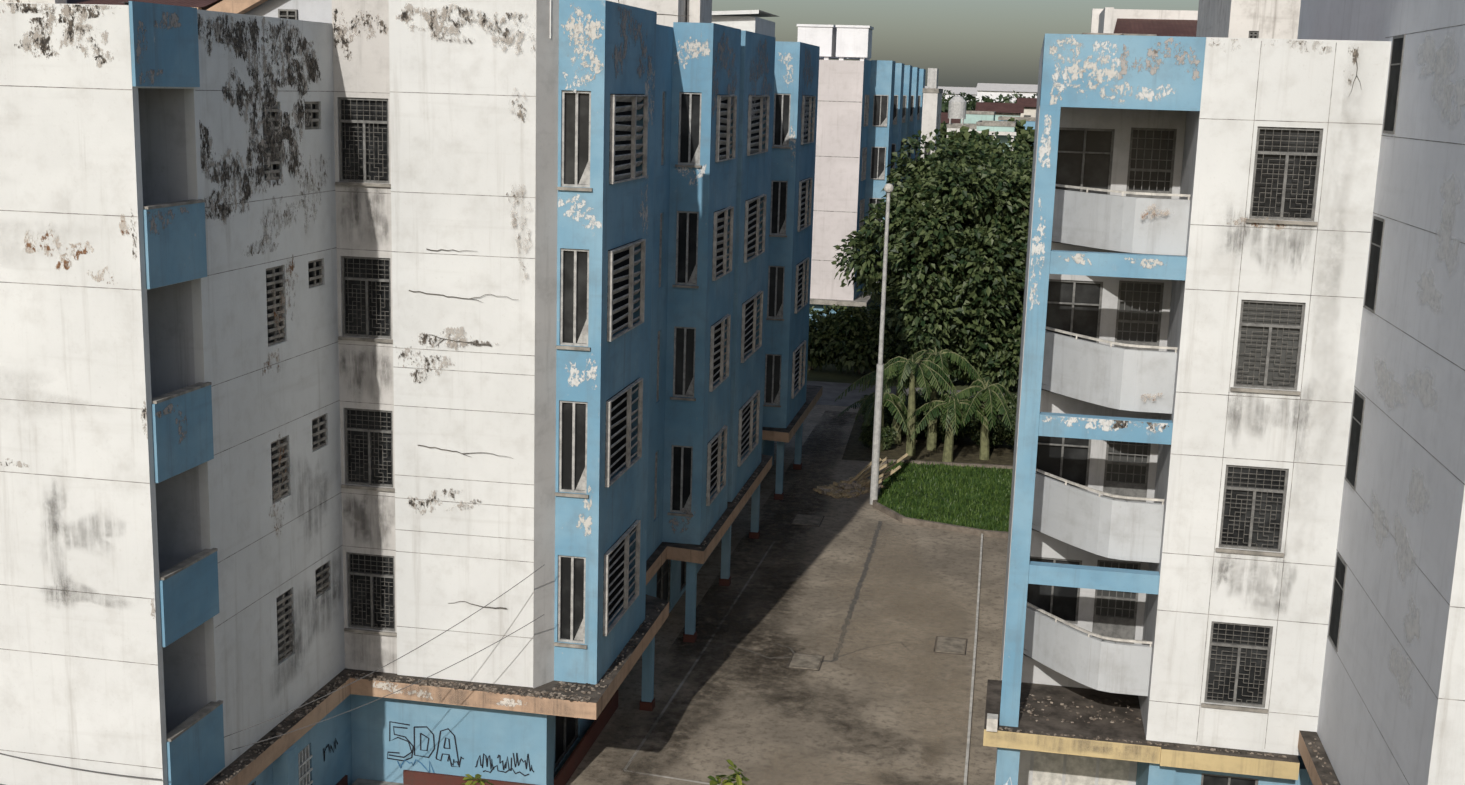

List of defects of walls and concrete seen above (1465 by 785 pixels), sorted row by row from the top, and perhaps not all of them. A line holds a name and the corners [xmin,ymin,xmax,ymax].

leakage [2,0,113,68]
mould [197,13,327,256]
mould [334,3,535,59]
peeling [561,5,655,126]
peeling [1038,35,1201,168]
crack [429,334,491,346]
crack [409,290,519,302]
peeling [1029,198,1092,310]